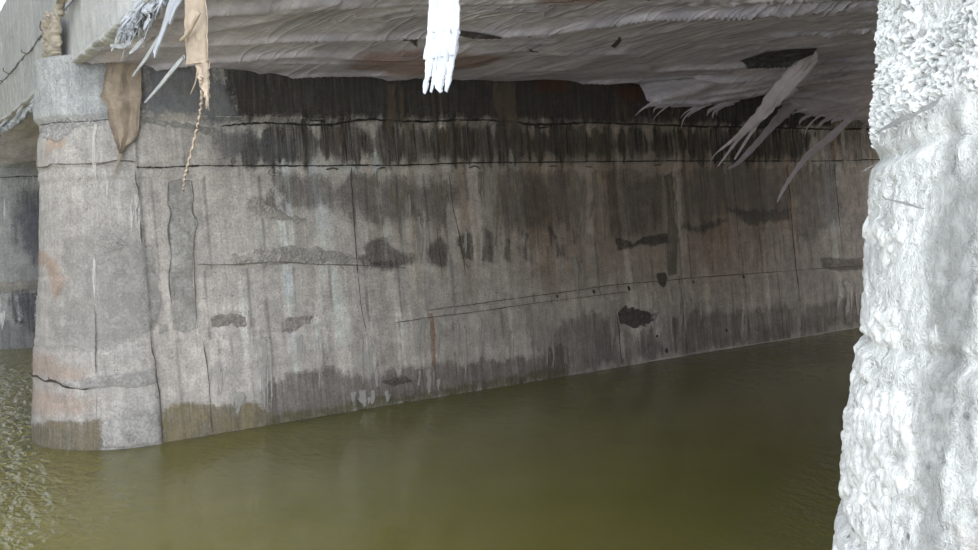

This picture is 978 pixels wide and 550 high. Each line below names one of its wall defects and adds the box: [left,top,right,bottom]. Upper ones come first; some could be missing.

damp [3,176,40,264]
damp [142,65,831,268]
crack [221,98,940,135]
damp [0,291,37,341]
damp [247,301,617,418]
crack [0,159,880,442]